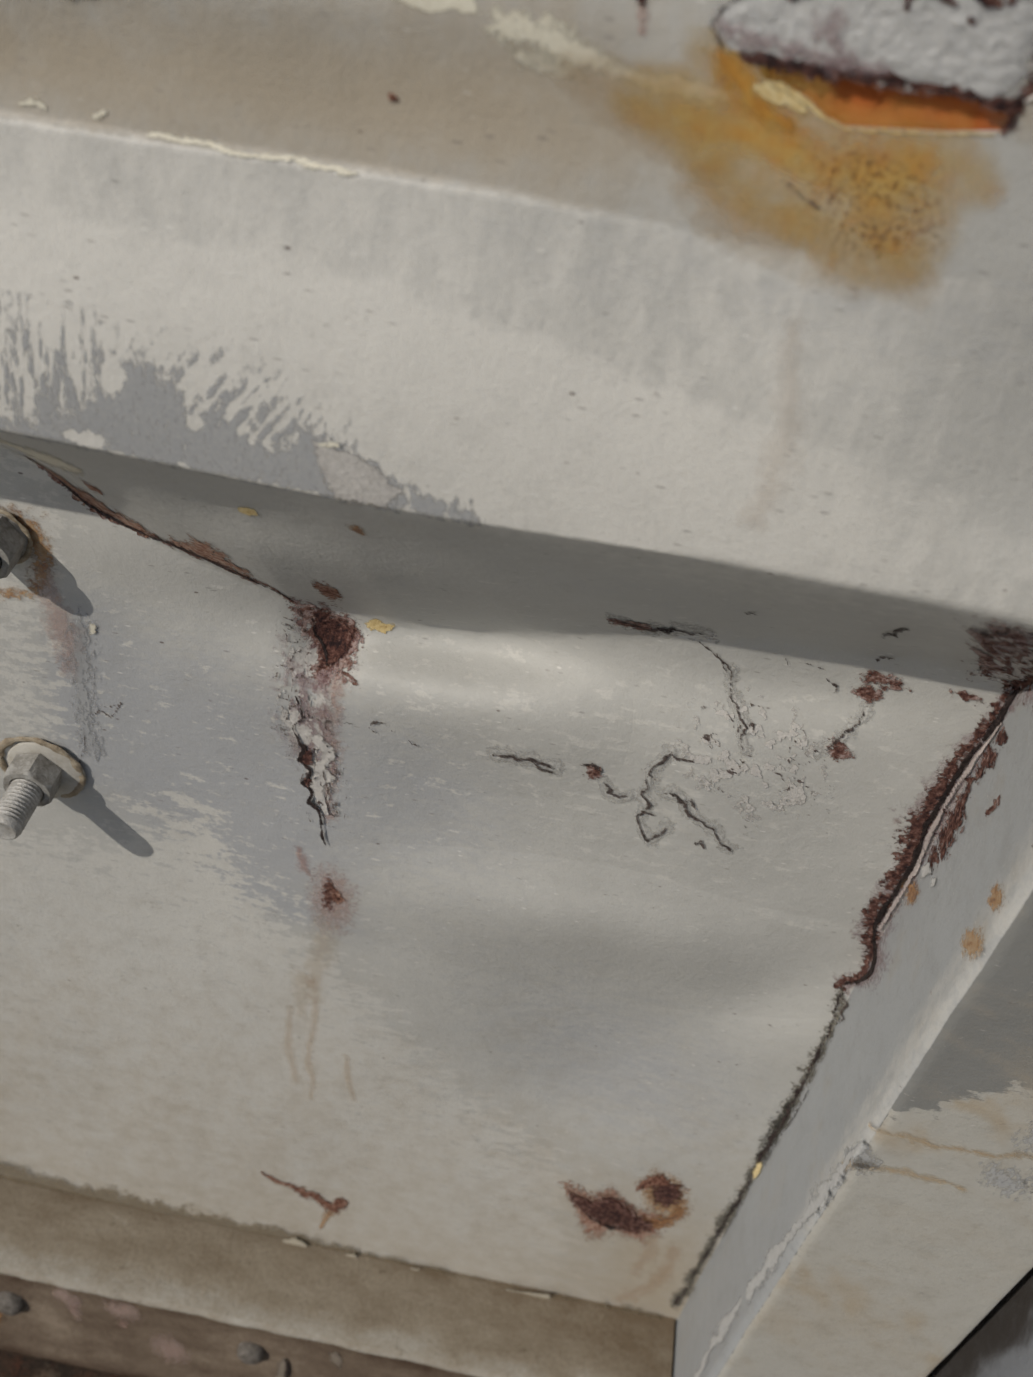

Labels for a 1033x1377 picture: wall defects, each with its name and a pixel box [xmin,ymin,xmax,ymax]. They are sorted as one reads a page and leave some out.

peeling [396,0,727,107]
rust [618,51,1033,268]
peeling [753,81,1001,136]
peeling [0,290,480,527]
rust [0,505,53,599]
crack [25,456,297,605]
crack [606,615,754,756]
crack [785,628,912,762]
crack [488,744,739,854]
rust [833,615,1033,991]
rust [558,1169,690,1247]
crack [669,988,848,1310]